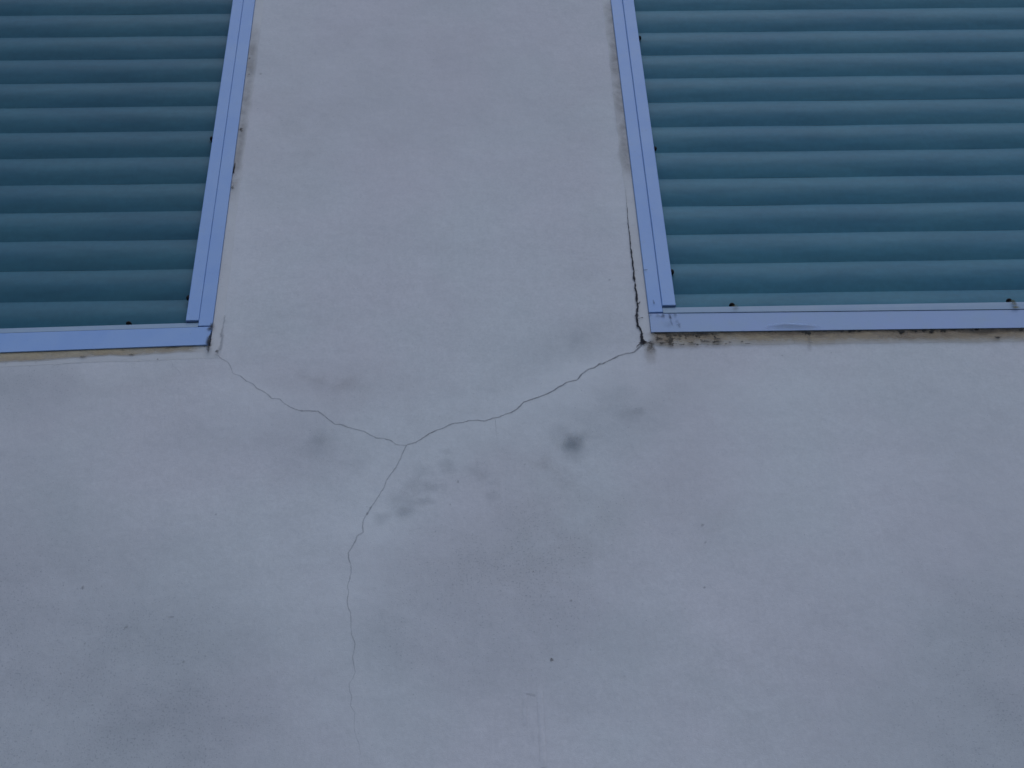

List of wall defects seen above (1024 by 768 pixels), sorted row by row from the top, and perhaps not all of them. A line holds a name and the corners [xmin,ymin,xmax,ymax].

crack [611,199,650,360]